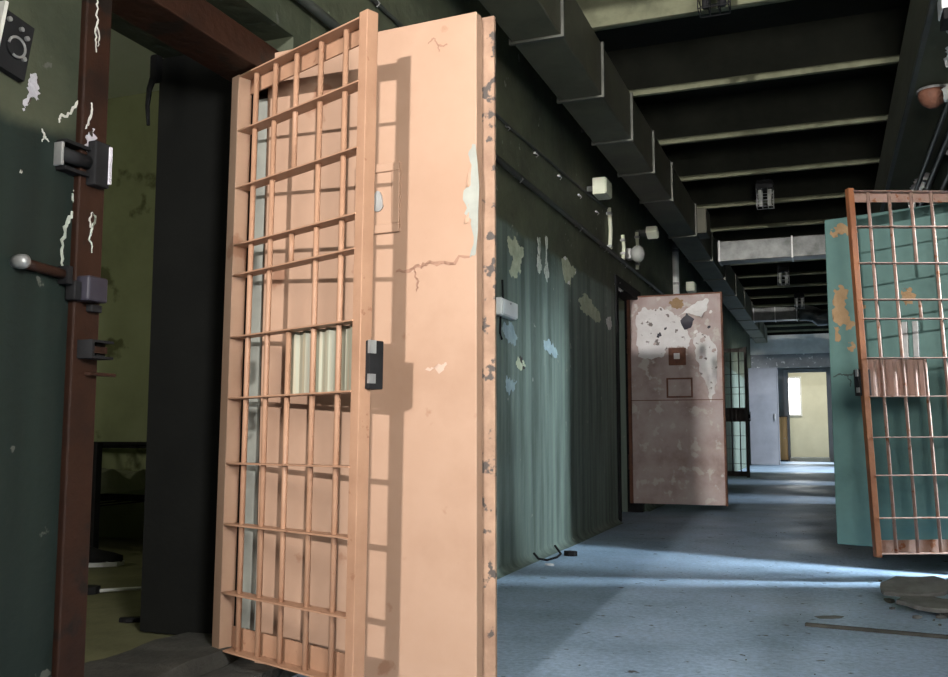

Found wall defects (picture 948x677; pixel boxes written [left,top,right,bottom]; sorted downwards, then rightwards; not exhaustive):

peeling [463,144,479,257]
crack [396,255,470,292]
peeling [507,235,524,278]
peeling [537,236,549,282]
peeling [562,256,576,285]
peeling [578,293,612,330]
peeling [501,320,526,396]
peeling [543,339,558,358]
peeling [636,298,717,402]